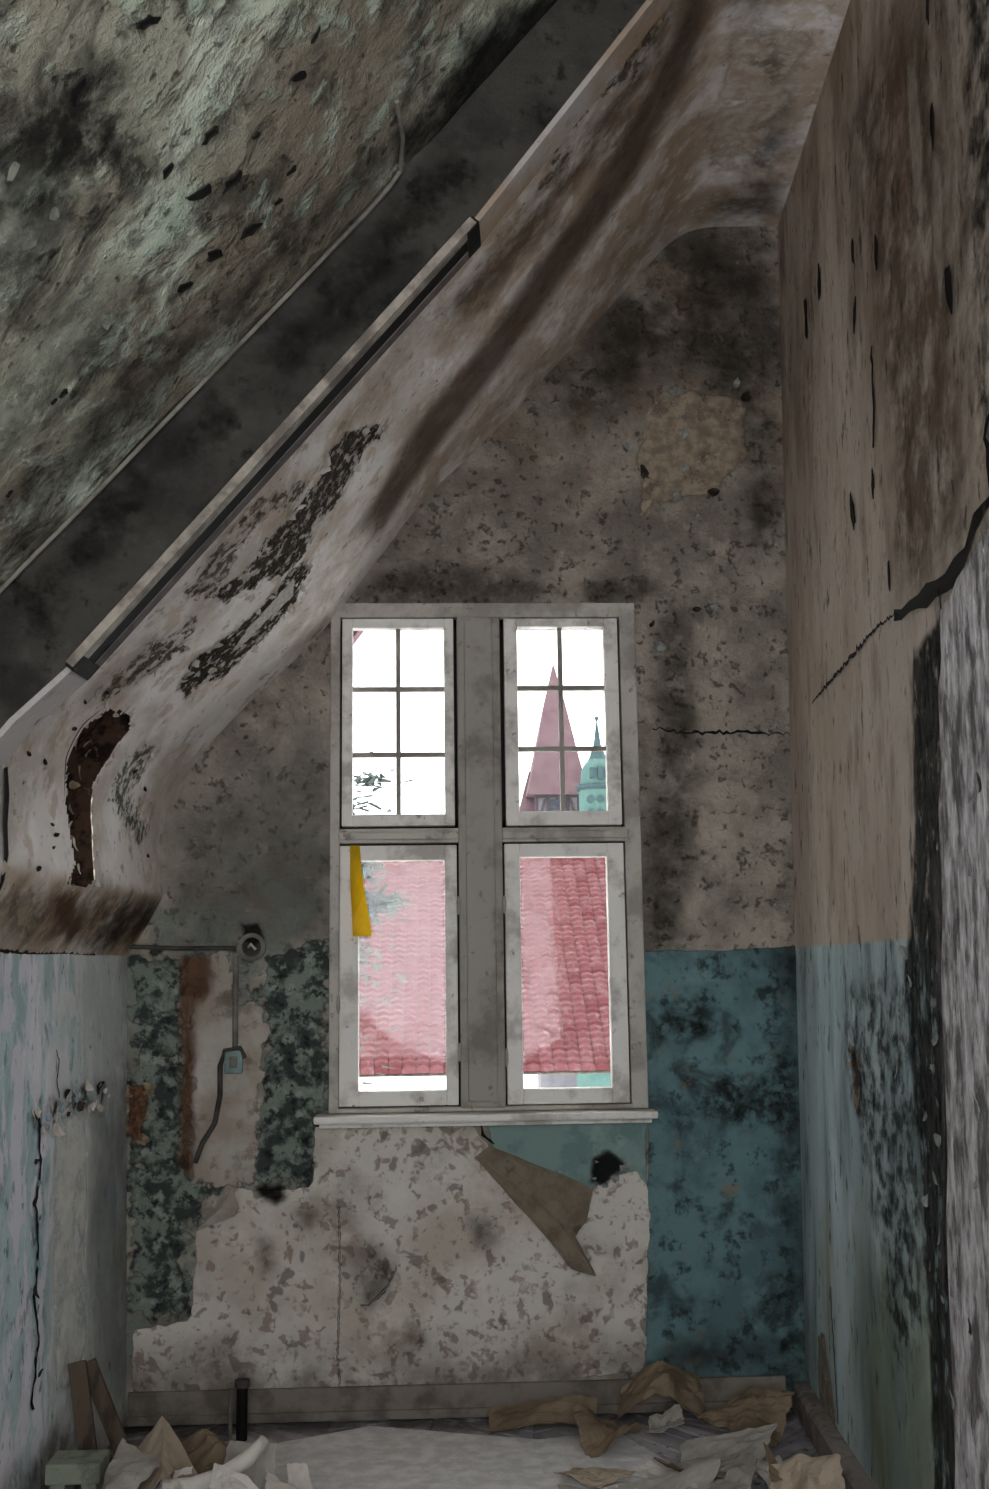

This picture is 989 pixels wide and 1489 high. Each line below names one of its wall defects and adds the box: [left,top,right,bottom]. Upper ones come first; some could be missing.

damp [0,65,134,234]
spalling [51,424,386,898]
damp [366,0,708,527]
peeling [625,377,752,517]
crack [652,727,790,736]
crack [868,346,876,448]
crack [812,413,989,704]
damp [853,44,962,577]
damp [966,0,989,435]
crack [22,1050,91,1410]
spalling [591,1151,629,1188]
damp [846,622,955,1489]